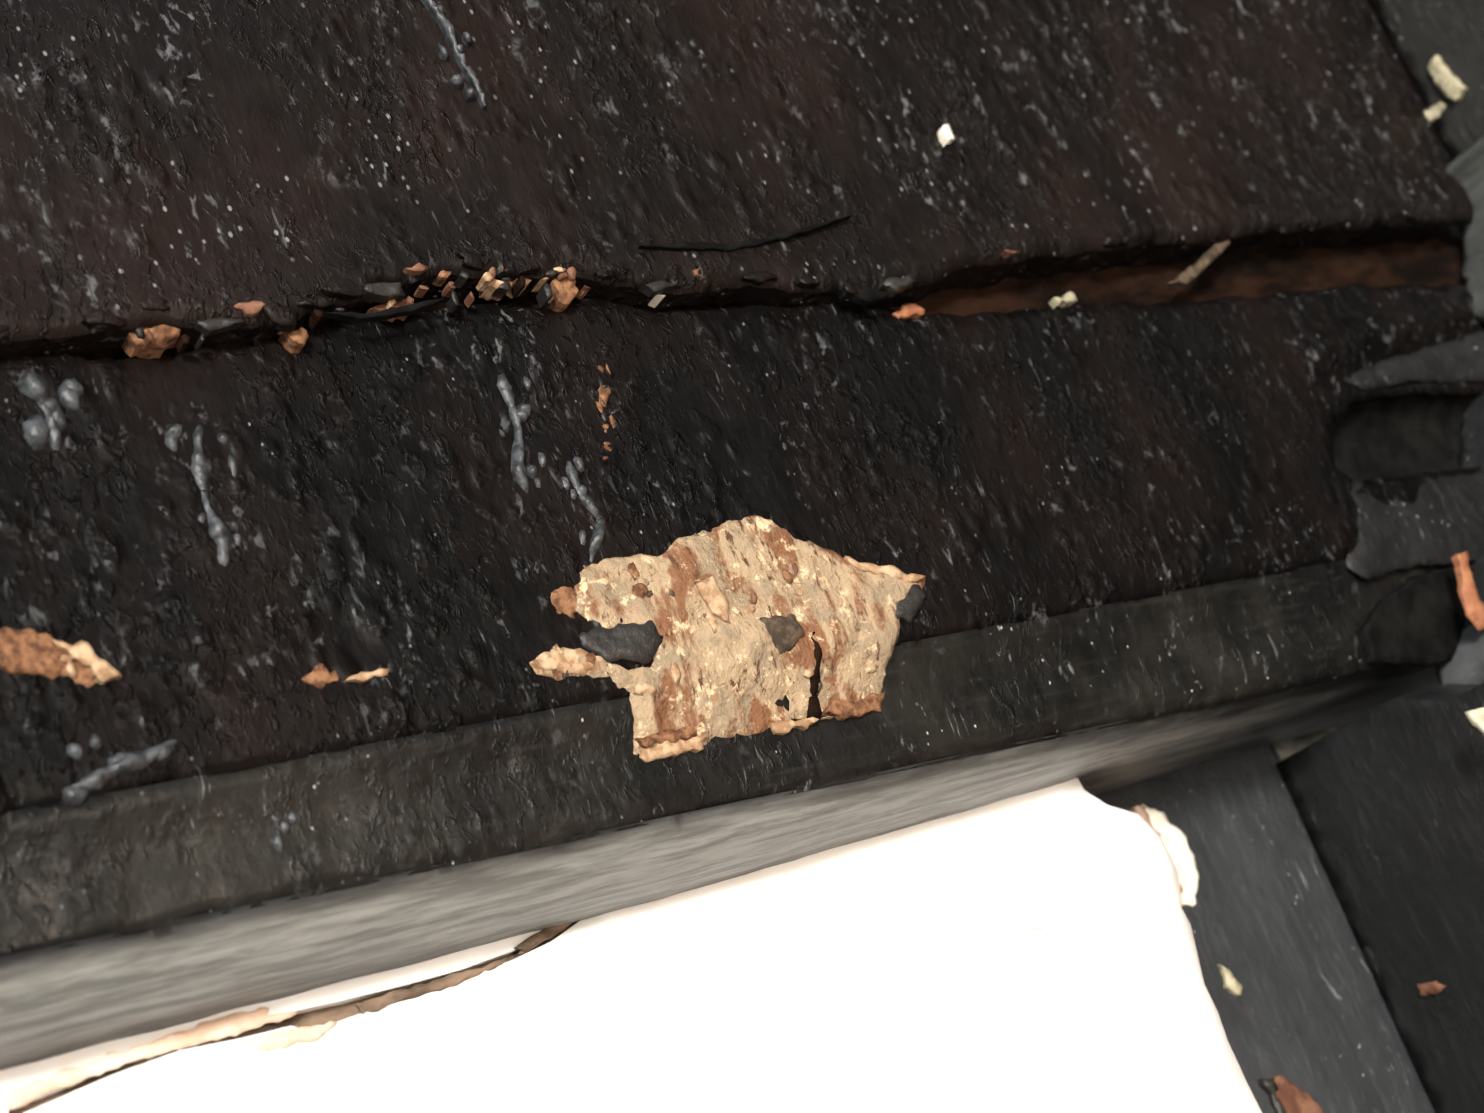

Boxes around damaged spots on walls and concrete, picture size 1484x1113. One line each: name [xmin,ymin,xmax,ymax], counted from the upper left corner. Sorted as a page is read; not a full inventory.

crack [81,209,1465,361]
peeling [0,627,122,688]
peeling [529,515,927,763]